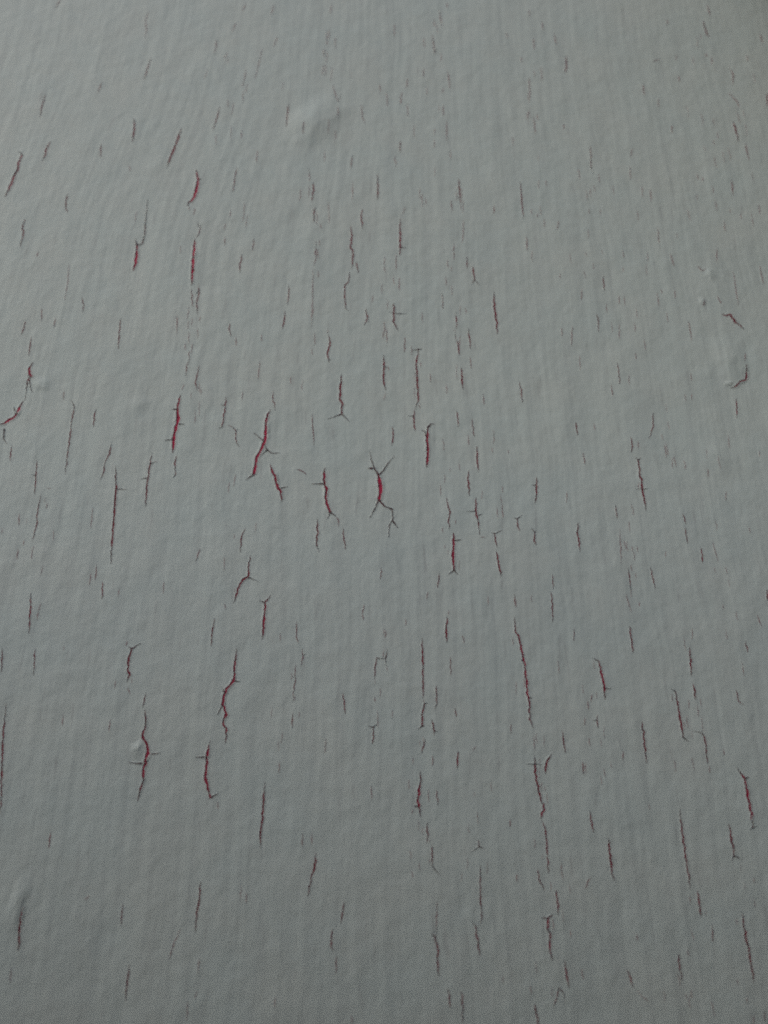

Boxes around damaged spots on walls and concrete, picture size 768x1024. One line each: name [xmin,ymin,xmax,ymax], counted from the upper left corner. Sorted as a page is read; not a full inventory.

crack [0,265,85,462]
crack [0,391,97,676]
crack [88,3,648,1024]
crack [559,4,768,706]
crack [626,628,766,1024]